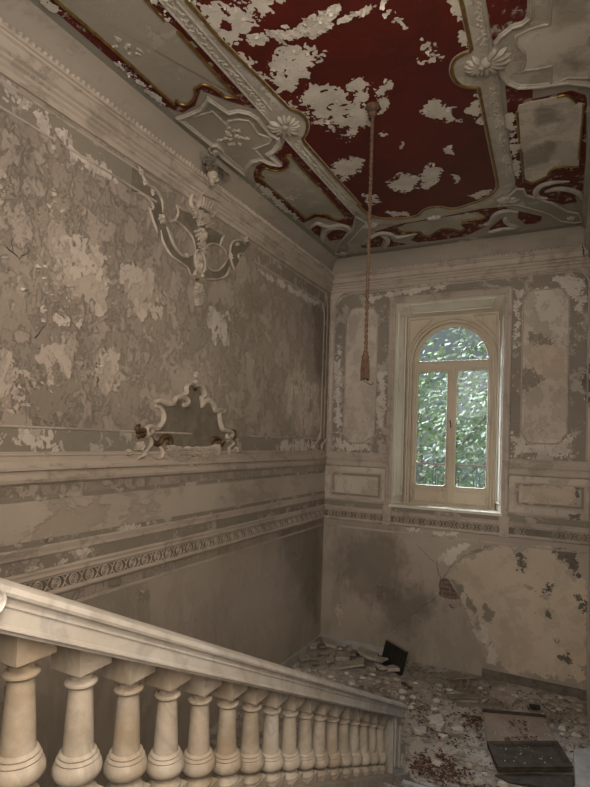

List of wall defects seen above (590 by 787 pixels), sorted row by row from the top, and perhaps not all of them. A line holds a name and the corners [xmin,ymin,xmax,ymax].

peeling [447,0,468,48]
peeling [183,0,409,143]
peeling [416,37,445,65]
flaking render [2,79,118,185]
peeling [419,94,484,125]
peeling [330,156,366,182]
peeling [385,162,461,194]
flaking render [34,234,166,322]
flaking render [0,305,83,414]
flaking render [91,347,130,397]
flaking render [0,424,60,458]
flaking render [433,531,588,686]